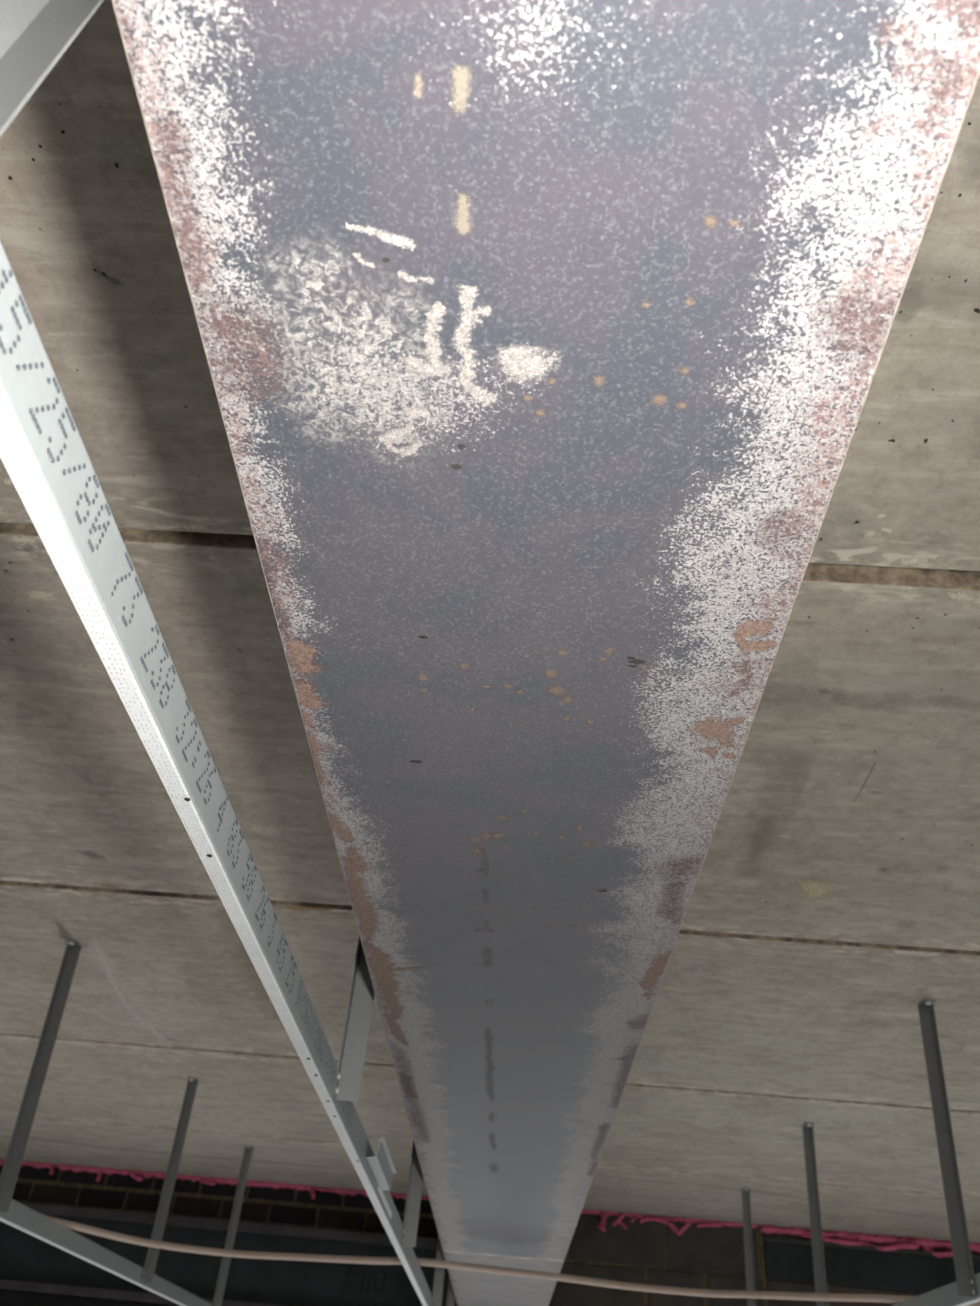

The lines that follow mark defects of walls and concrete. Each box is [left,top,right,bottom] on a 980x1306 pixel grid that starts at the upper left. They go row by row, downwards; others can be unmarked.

rust [928,0,980,33]
rust [881,22,965,133]
rust [819,290,891,361]
rust [731,619,777,697]
rust [689,703,758,759]
rust [329,814,428,1141]
rust [640,951,671,1000]